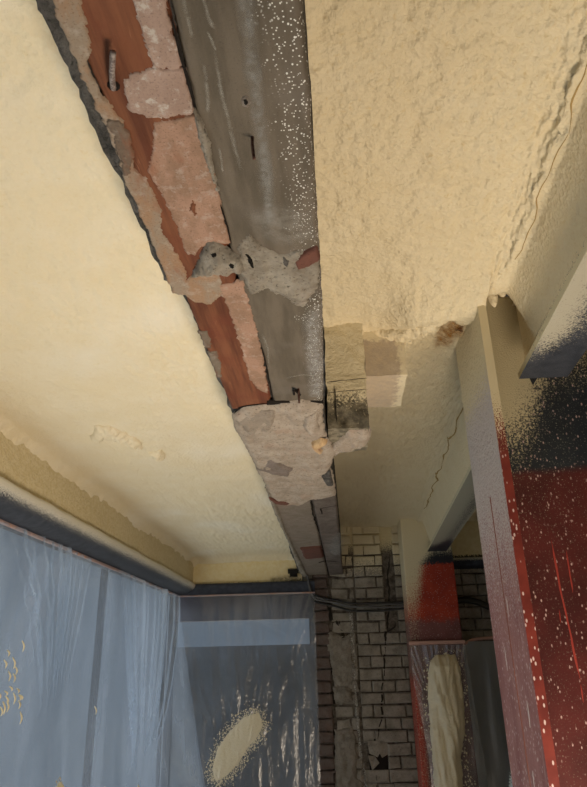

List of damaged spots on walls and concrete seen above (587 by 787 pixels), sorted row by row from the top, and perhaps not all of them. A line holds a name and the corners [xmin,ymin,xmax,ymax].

flaking render [53,0,321,393]
crack [515,65,587,259]
corrosion [438,322,463,345]
spalling [232,399,336,506]
crack [424,408,463,509]
spalling [327,631,354,705]
spalling [334,726,363,787]
spalling [367,739,389,770]